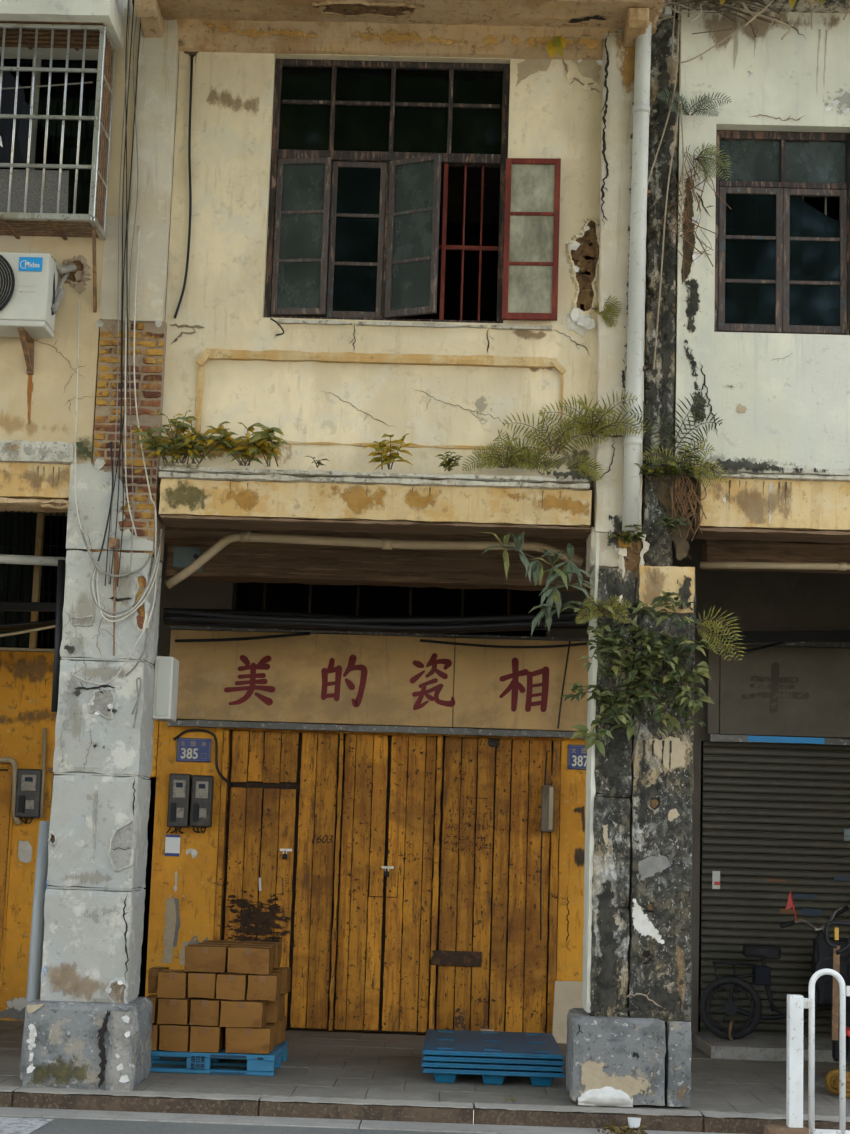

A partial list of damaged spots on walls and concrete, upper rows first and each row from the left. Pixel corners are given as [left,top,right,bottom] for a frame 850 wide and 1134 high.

crack [562,15,610,228]
flaking render [565,217,599,336]
water stain [643,31,709,561]
flaking render [90,320,167,557]
water stain [331,486,386,514]
water stain [538,469,591,514]
water stain [607,515,628,549]
water stain [605,568,695,636]
peeling [648,736,688,771]
peeling [638,853,671,882]
peeling [632,899,664,964]
crack [97,1009,111,1089]